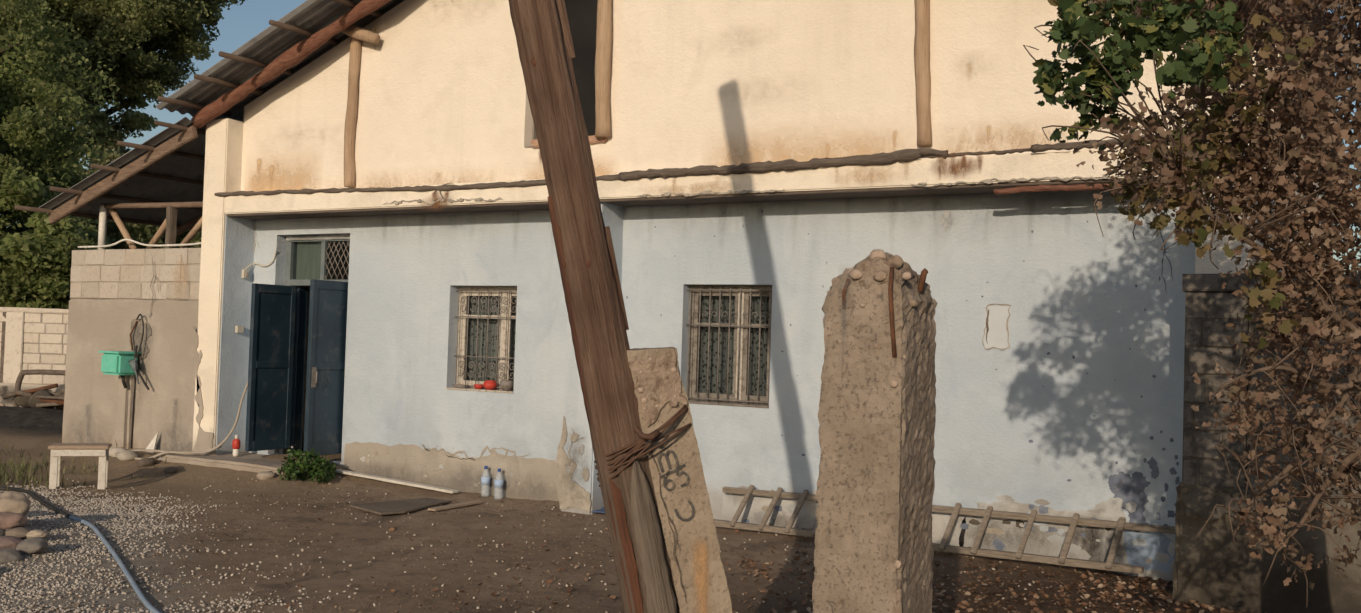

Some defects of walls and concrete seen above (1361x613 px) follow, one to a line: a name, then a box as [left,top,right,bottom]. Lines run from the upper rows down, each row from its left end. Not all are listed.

water stain [727,145,879,166]
flaking render [343,416,592,513]
flaking render [931,430,1255,575]